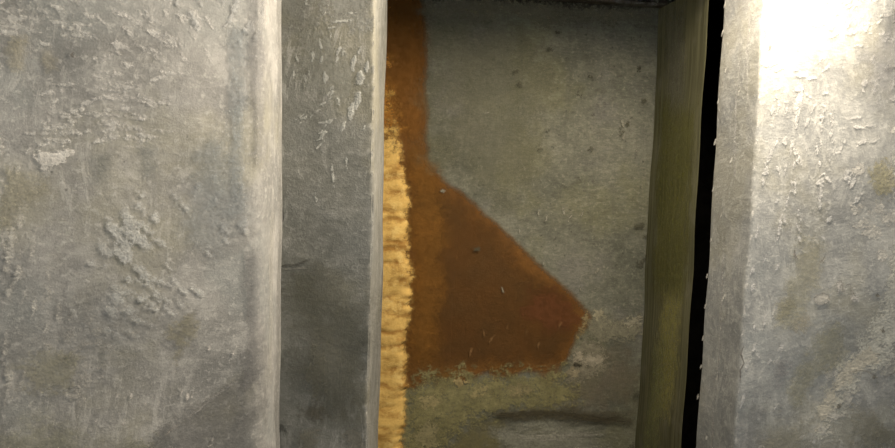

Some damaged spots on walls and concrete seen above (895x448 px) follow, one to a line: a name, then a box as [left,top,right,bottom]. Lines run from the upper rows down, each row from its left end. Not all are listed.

rust [384,0,591,389]